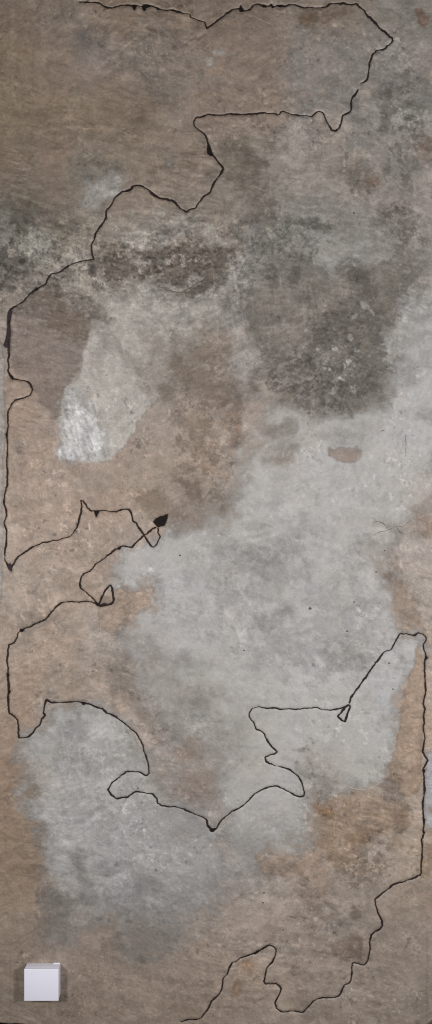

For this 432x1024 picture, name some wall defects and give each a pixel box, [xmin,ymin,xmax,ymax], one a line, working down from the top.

crack [79,1,393,84]
crack [3,89,358,832]
damp [89,121,418,418]
crack [180,632,429,1022]